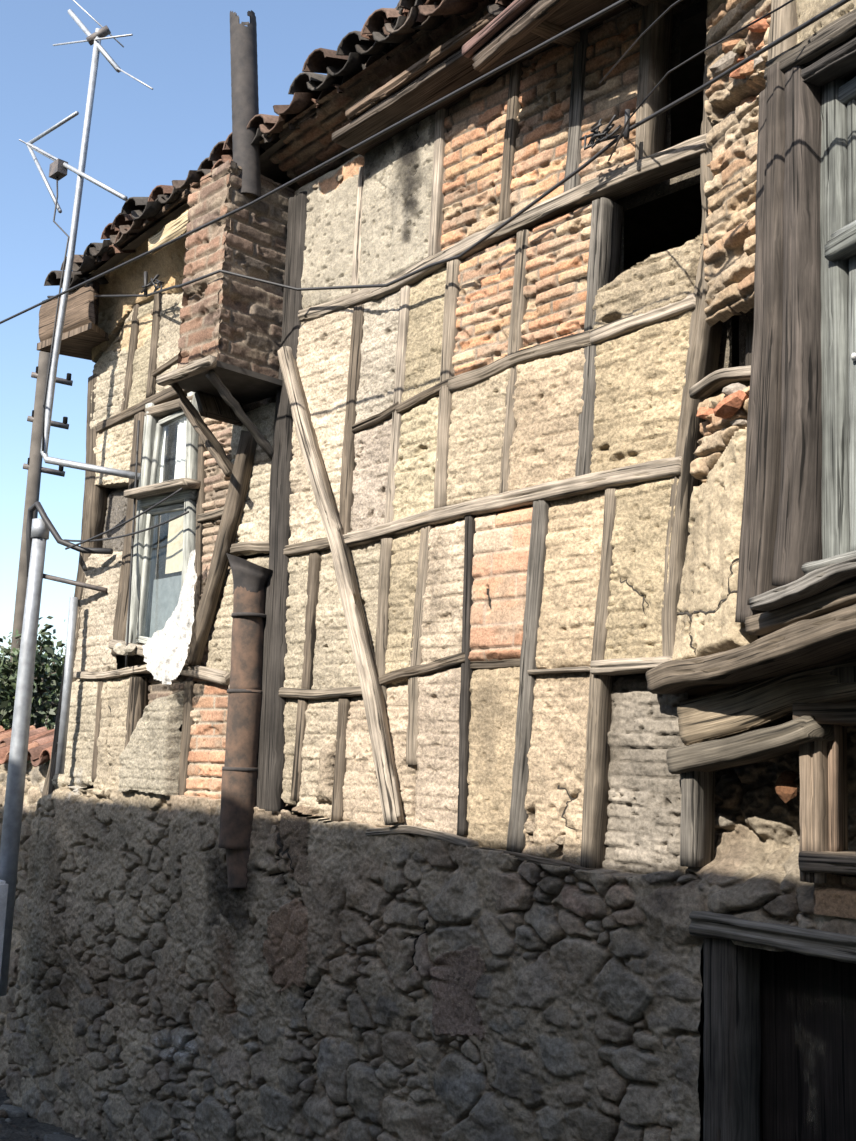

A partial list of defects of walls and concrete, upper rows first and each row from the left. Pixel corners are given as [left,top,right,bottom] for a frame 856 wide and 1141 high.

spalling [709,15,771,82]
spalling [690,383,750,483]
crack [620,578,650,614]
crack [677,558,739,653]